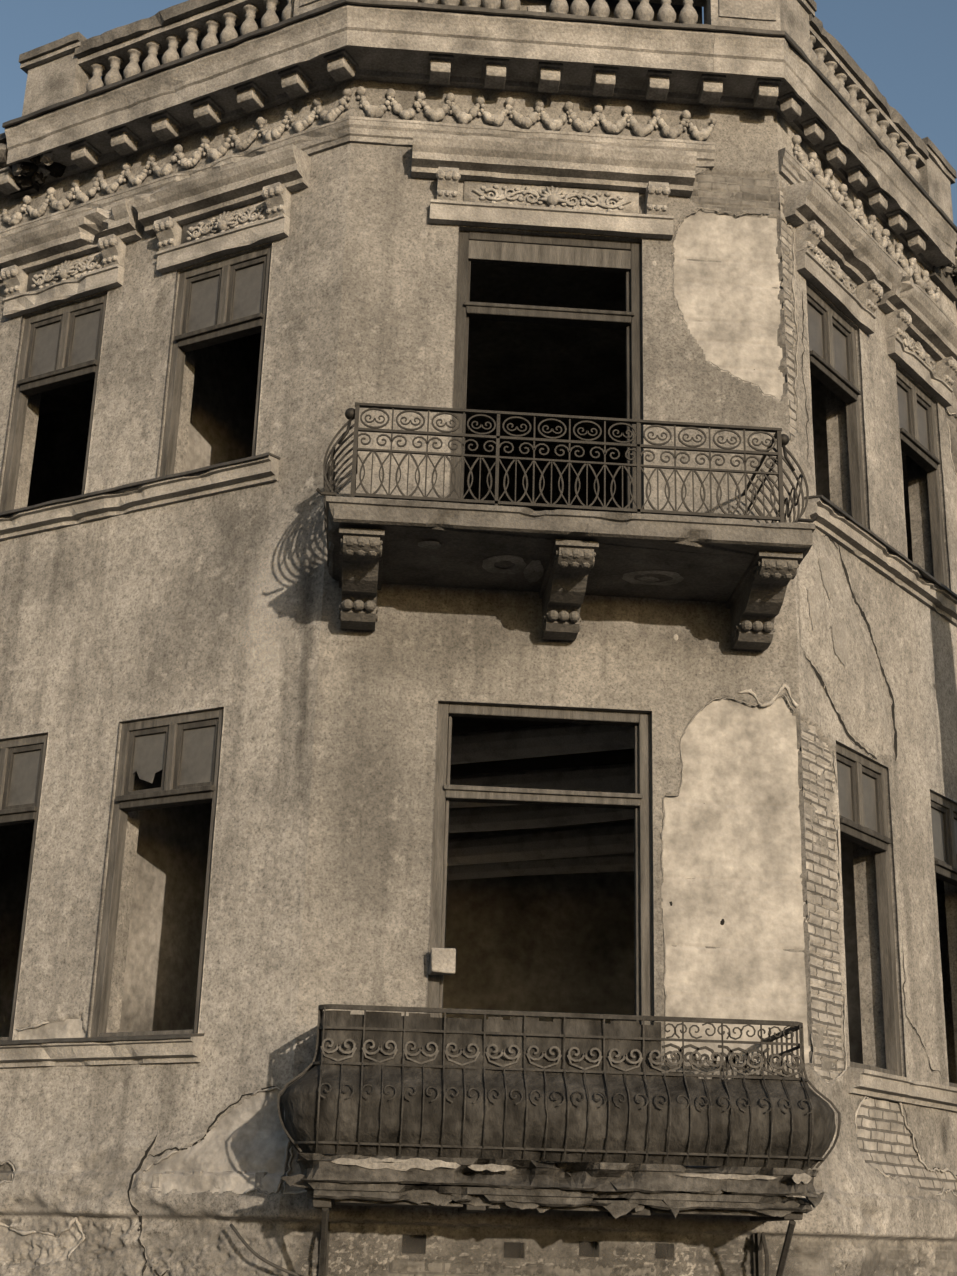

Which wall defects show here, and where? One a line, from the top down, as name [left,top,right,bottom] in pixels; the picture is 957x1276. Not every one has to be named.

flaking render [672,208,786,401]
crack [804,532,897,761]
flaking render [661,683,814,1064]
crack [127,1086,275,1276]
flaking render [142,1087,339,1195]
spalling [325,1154,552,1213]
flaking render [580,1190,645,1219]
flaking render [663,1192,703,1219]
spalling [677,1173,776,1195]
flaking render [754,1173,824,1217]
flaking render [854,1096,957,1197]